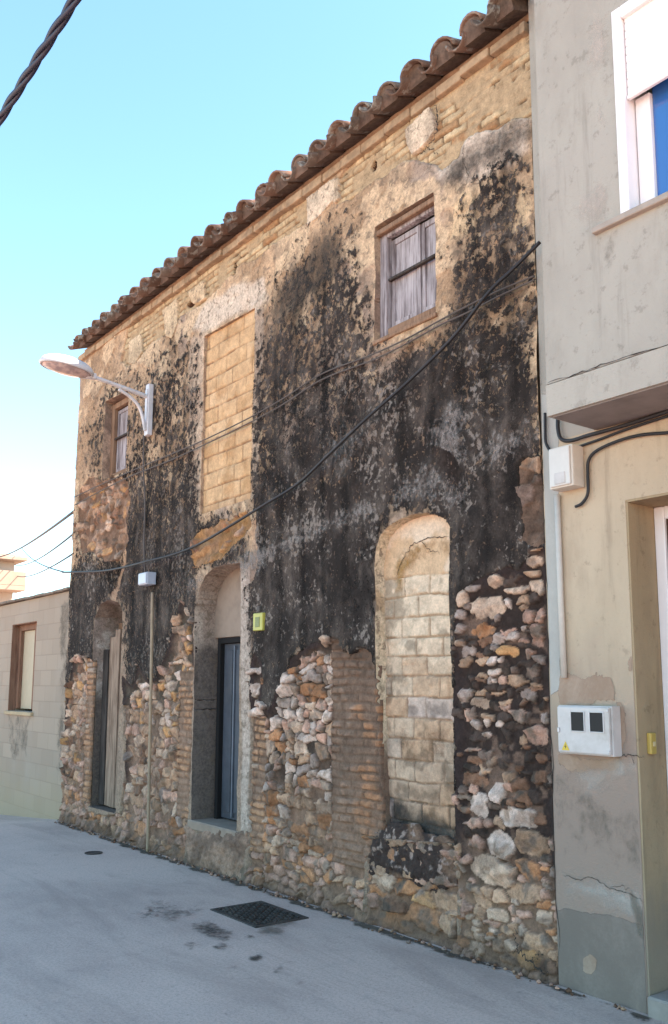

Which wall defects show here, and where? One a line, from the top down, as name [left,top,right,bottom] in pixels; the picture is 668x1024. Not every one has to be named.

flaking render [123,35,532,367]
water stain [61,149,545,710]
crack [397,536,445,574]
crack [540,449,548,582]
crack [512,620,644,975]